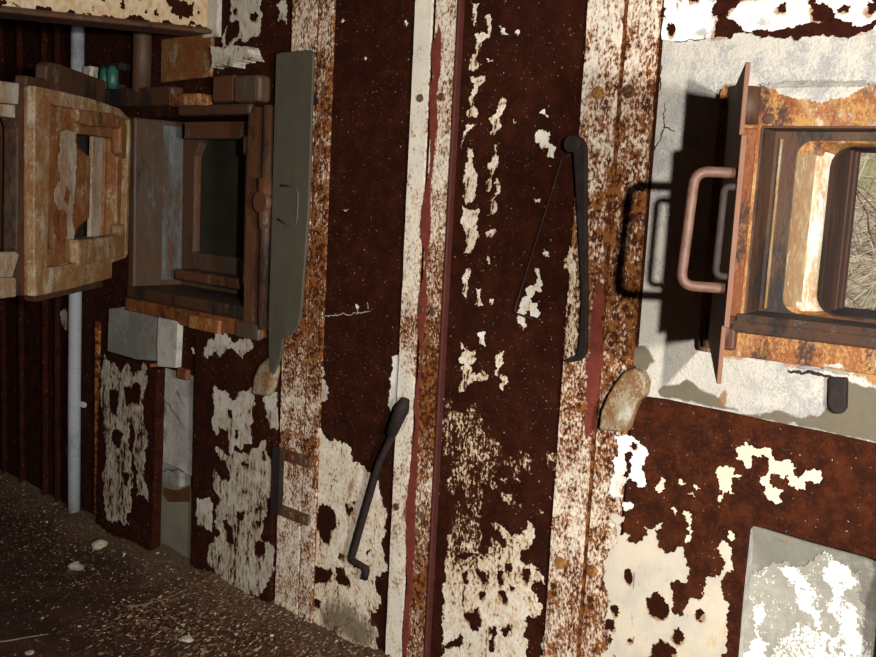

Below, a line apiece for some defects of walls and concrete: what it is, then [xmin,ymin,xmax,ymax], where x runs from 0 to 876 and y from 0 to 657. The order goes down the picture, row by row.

rust [54,186,70,243]
peeling [100,354,149,526]
peeling [195,385,279,596]
peeling [313,428,388,649]
peeling [462,268,494,306]
peeling [460,3,520,253]
peeling [441,331,544,657]
peeling [517,268,543,328]
peeling [535,129,556,158]
peeling [600,434,735,657]
peeling [715,442,822,504]
rust [845,371,876,384]